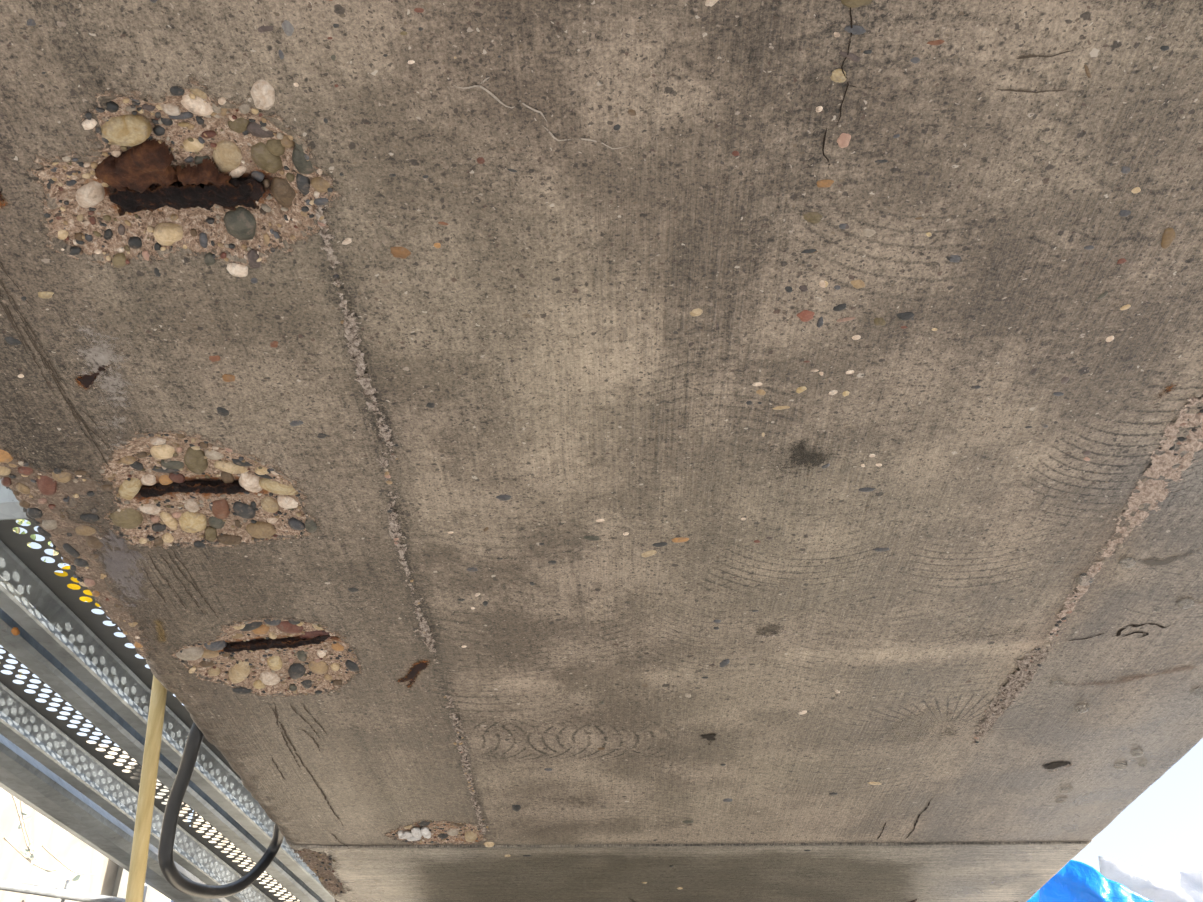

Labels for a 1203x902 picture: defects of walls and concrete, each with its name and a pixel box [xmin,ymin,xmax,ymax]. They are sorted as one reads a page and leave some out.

crack [822,7,874,169]
corrosion [76,365,109,390]
spalling [0,73,441,663]
spalling [171,616,362,698]
corrosion [397,660,428,688]
crack [1069,623,1170,641]
spalling [384,695,494,847]